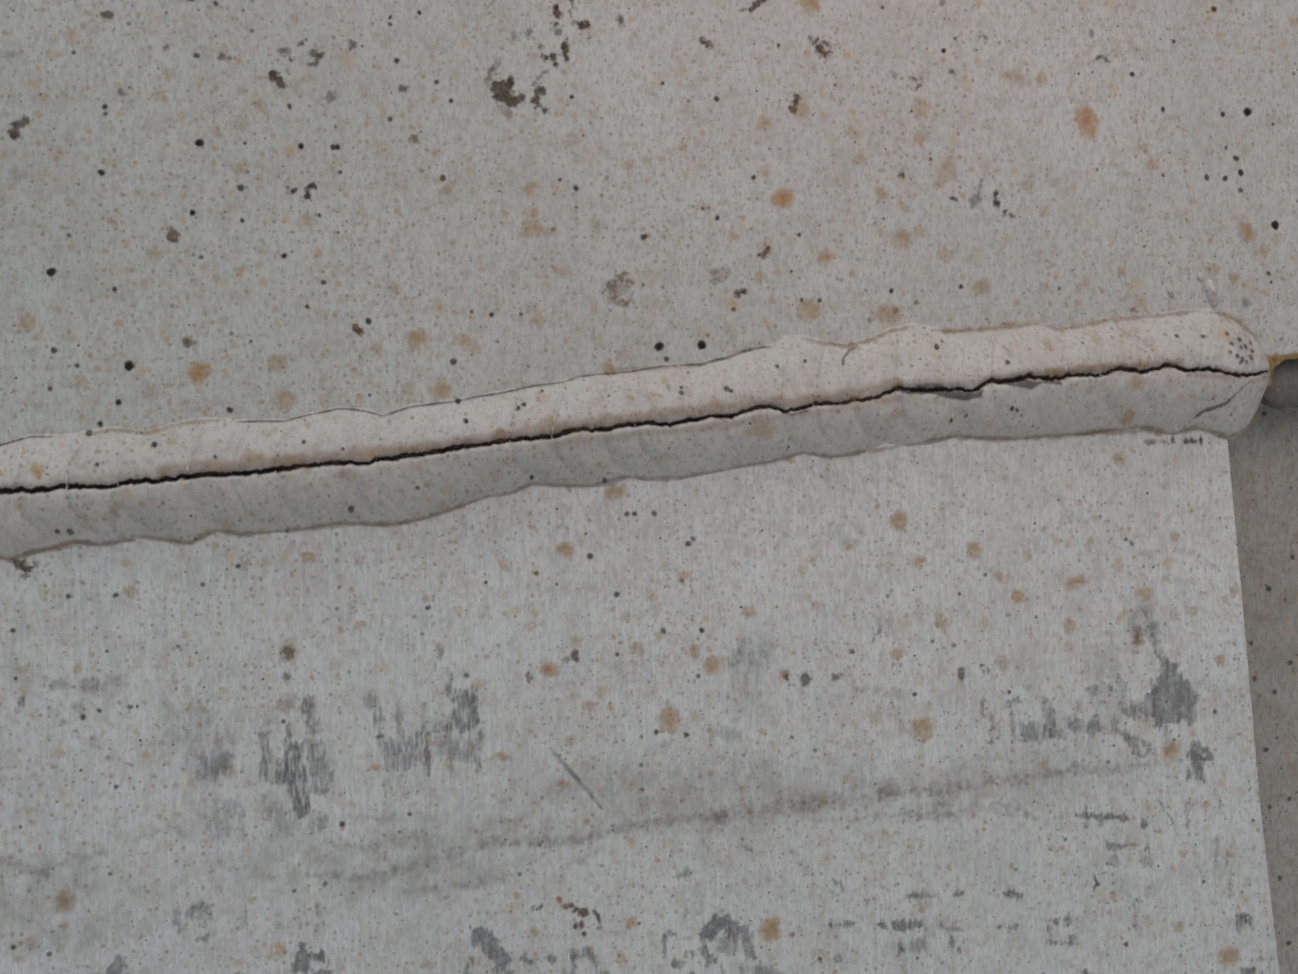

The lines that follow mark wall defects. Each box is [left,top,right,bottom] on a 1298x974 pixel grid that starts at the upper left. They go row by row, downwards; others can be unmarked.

crack [689,346,764,365]
crack [0,363,1267,494]